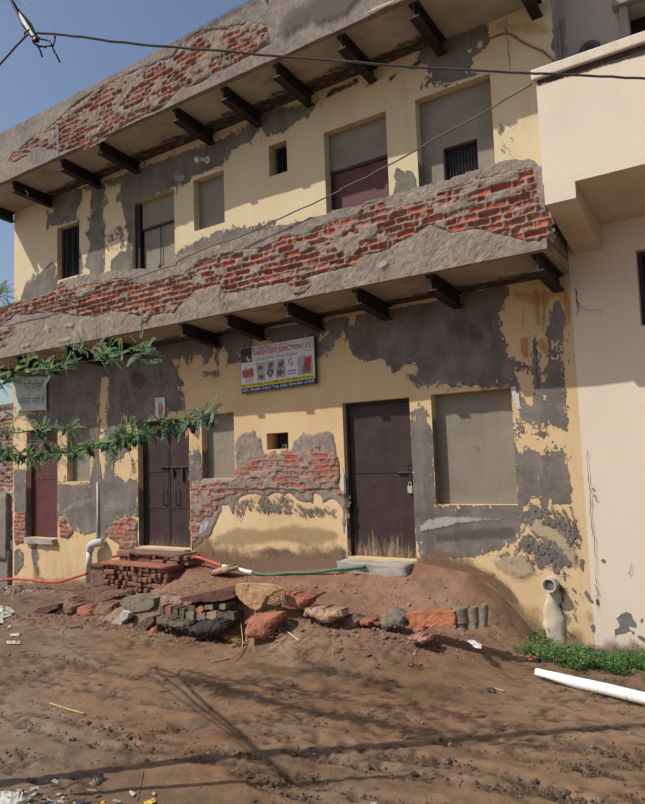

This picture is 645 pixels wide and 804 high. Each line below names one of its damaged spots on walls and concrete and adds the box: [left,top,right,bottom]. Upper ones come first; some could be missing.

flaking render [8,21,271,163]
flaking render [417,24,490,91]
flaking render [0,96,556,342]
flaking render [19,333,253,550]
flaking render [188,430,351,555]
flaking render [264,285,584,581]
crack [587,451,599,606]
flaking render [614,612,645,643]